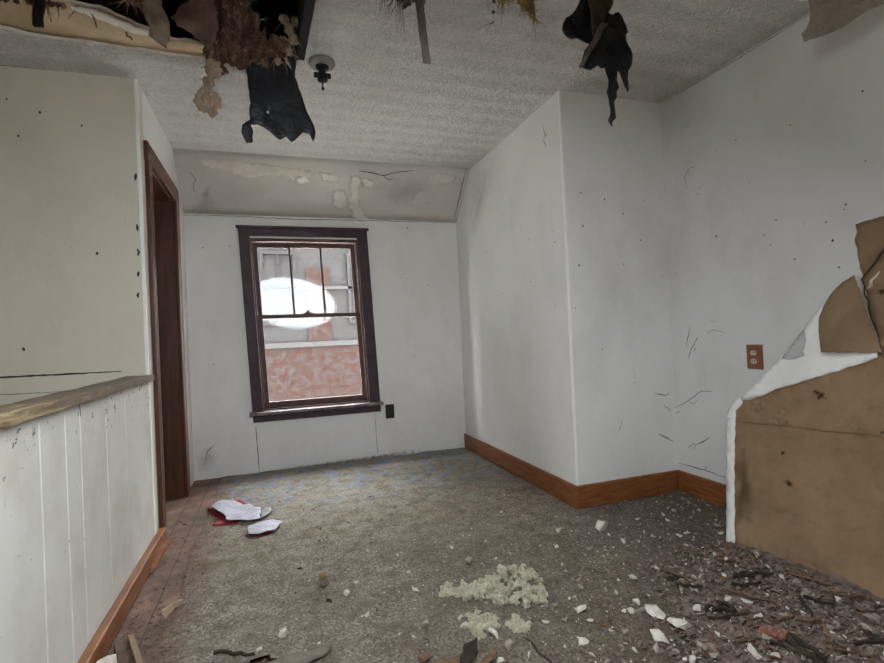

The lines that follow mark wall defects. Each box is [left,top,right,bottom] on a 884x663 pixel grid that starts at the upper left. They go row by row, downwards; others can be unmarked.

spalling [855,216,884,275]